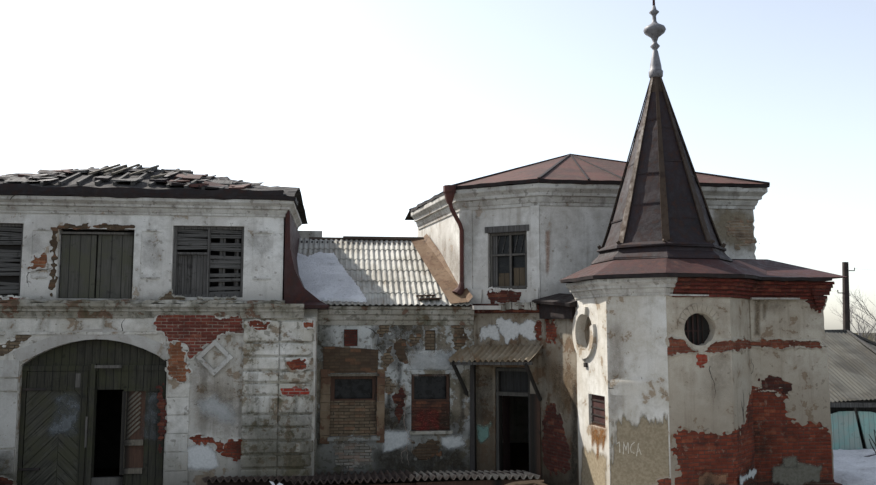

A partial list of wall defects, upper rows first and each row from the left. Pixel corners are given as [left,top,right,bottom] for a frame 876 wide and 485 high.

flaking render [714,209,760,251]
flaking render [26,223,135,297]
flaking render [158,289,237,300]
flaking render [0,331,34,358]
flaking render [450,325,470,362]
flaking render [665,334,824,370]
flaking render [151,315,272,453]
flaking render [375,325,423,423]
flaking render [188,432,242,464]
flaking render [329,434,378,473]
flaking render [410,437,443,462]
flaking render [541,373,833,485]